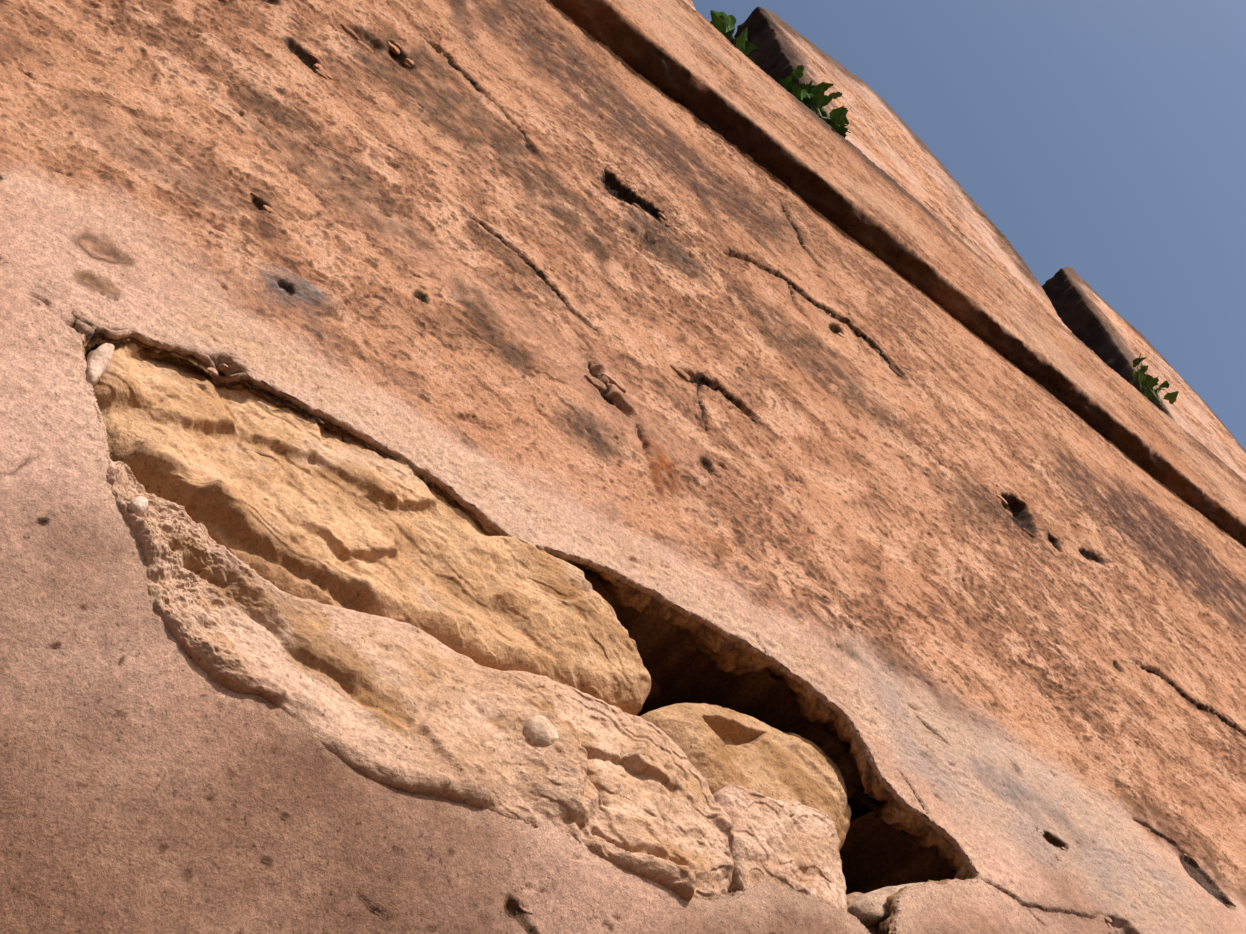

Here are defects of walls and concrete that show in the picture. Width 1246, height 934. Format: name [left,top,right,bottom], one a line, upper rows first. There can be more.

crack [782,204,805,250]
crack [723,251,902,378]
crack [670,364,755,431]
spalling [80,325,981,934]
crack [1140,666,1246,737]
crack [986,882,1094,919]
spalling [1103,915,1140,934]